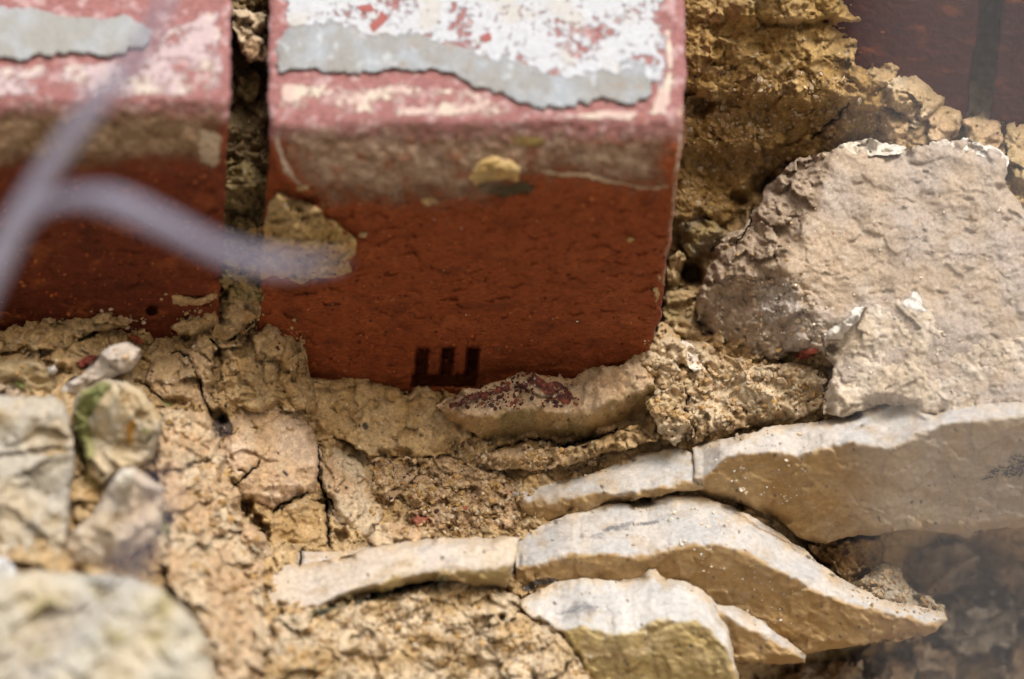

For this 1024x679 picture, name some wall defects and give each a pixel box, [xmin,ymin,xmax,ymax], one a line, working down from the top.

flaking render [0,6,146,61]
peeling [275,0,666,109]
spalling [0,112,72,165]
spalling [68,111,222,167]
spalling [275,128,669,201]
peeling [793,306,867,360]
crack [232,461,260,490]
crack [273,446,337,547]